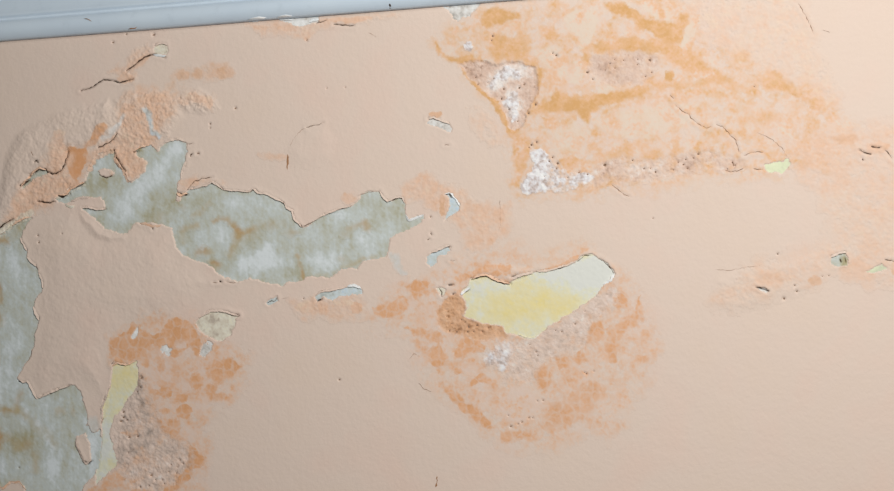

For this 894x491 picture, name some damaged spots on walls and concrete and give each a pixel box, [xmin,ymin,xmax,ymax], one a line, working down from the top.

crack [81,44,165,91]
peeling [0,208,197,491]
damp [102,305,258,491]
peeling [196,309,239,357]
peeling [55,137,424,300]
peeling [436,254,615,342]
damp [285,0,894,460]
damp [82,469,145,491]